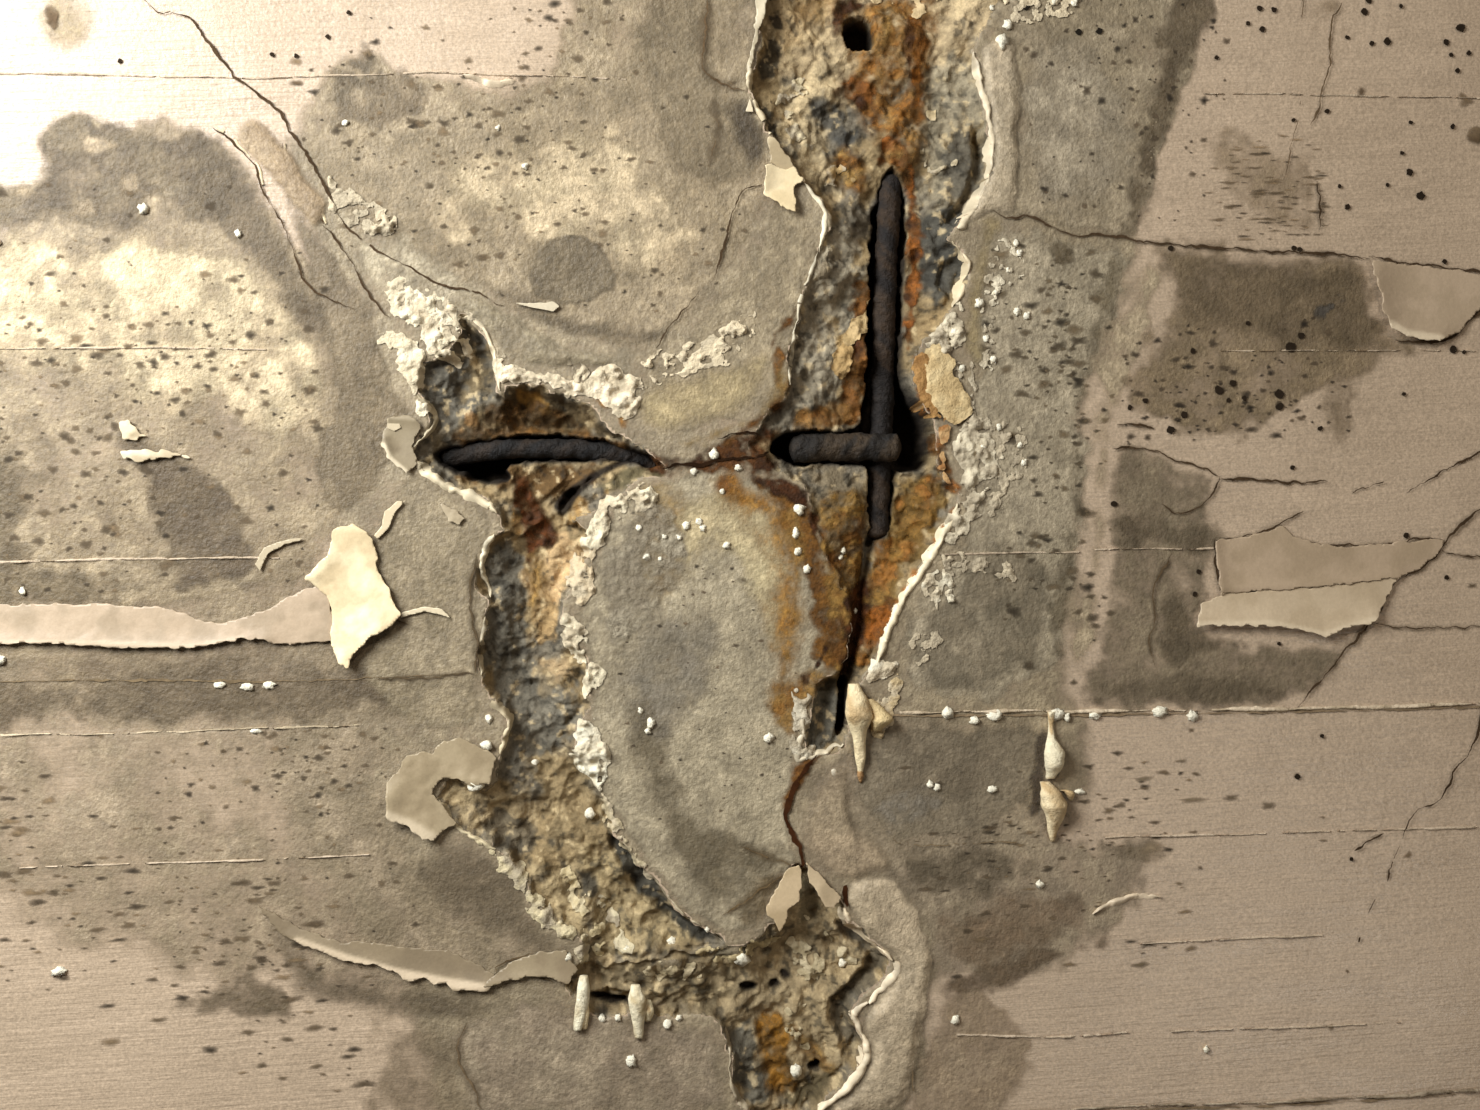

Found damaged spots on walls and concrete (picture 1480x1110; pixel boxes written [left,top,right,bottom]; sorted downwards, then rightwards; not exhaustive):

crack [145,0,504,317]
corrosion [805,0,934,342]
crack [993,0,1480,272]
peeling [0,501,450,668]
corrosion [513,475,558,605]
spalling [255,314,901,1110]
corrosion [648,281,960,732]
damp [831,299,870,379]
spalling [746,0,1004,763]
damp [1088,434,1339,713]
crack [1116,423,1480,706]
damp [396,976,744,1110]